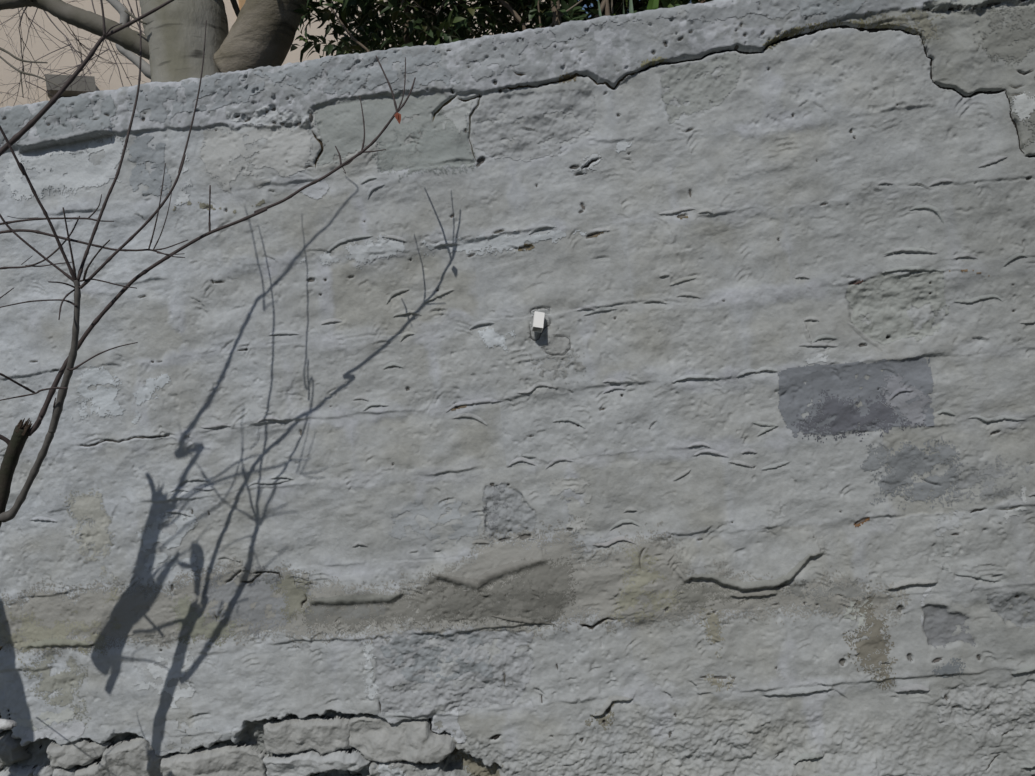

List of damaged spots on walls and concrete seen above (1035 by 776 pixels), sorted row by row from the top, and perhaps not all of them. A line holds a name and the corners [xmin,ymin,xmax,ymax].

crack [433,25,1035,160]
crack [529,308,571,356]
water stain [0,482,911,731]
spalling [0,628,534,776]